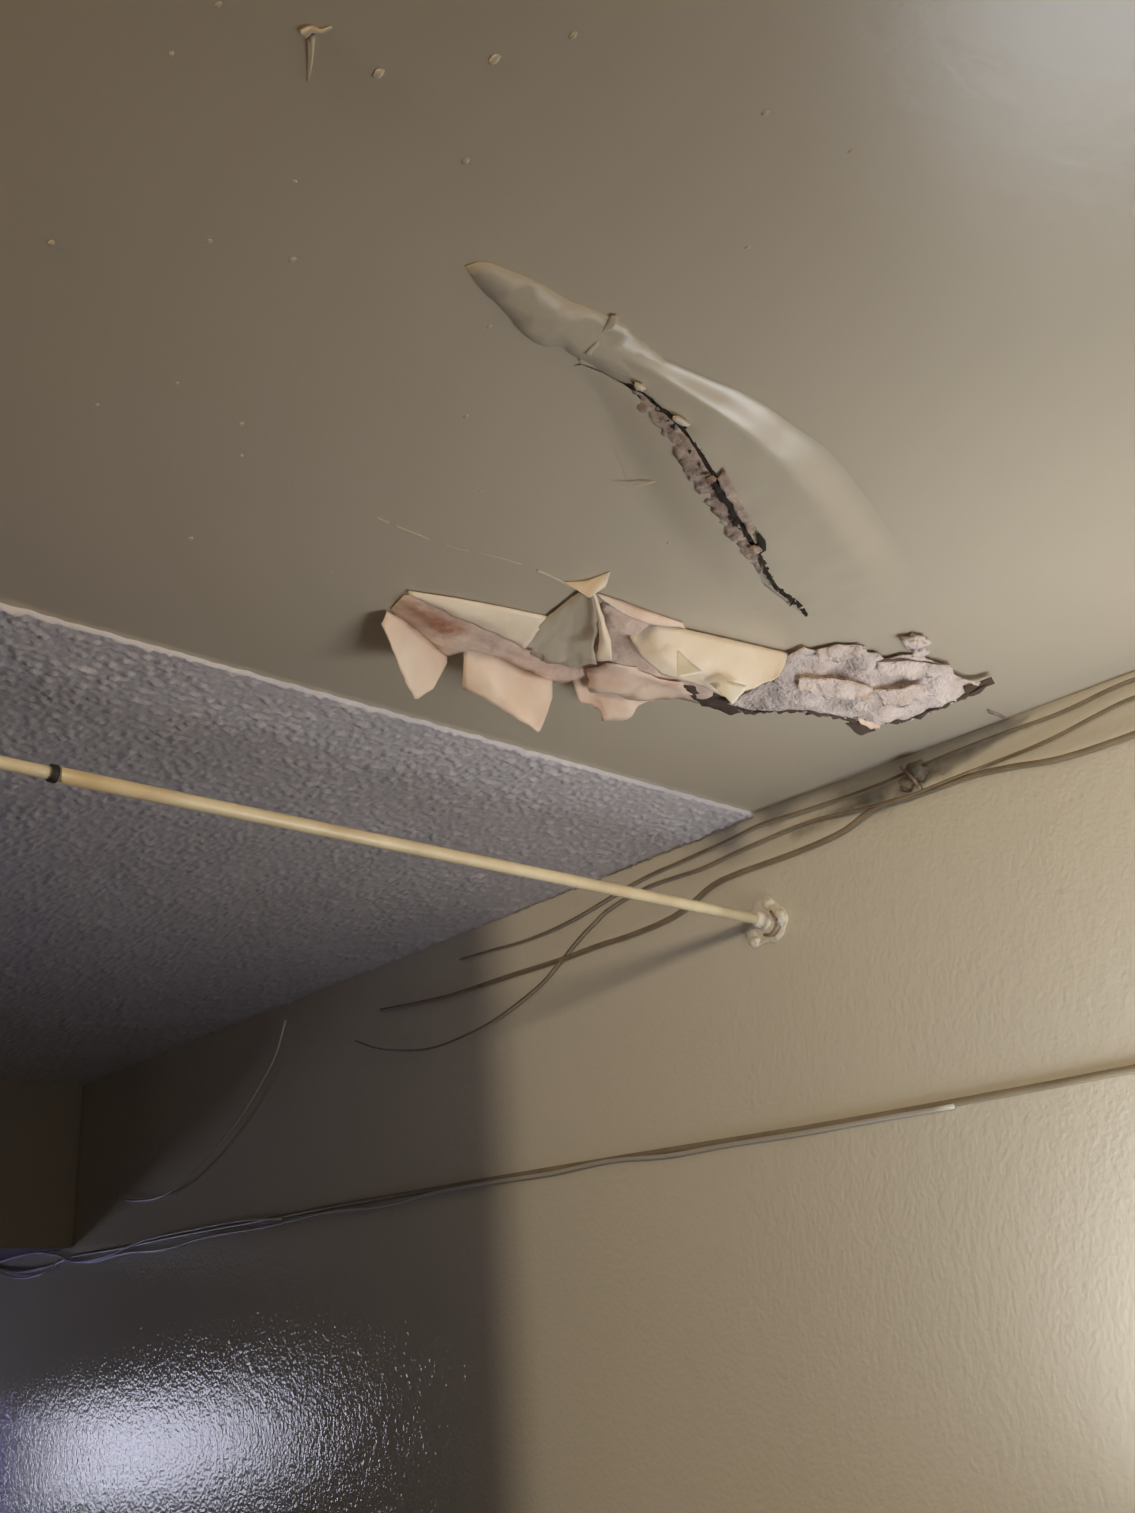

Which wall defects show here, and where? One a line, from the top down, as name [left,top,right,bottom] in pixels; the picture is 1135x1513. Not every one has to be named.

crack [631,381,808,617]
peeling [381,572,995,735]